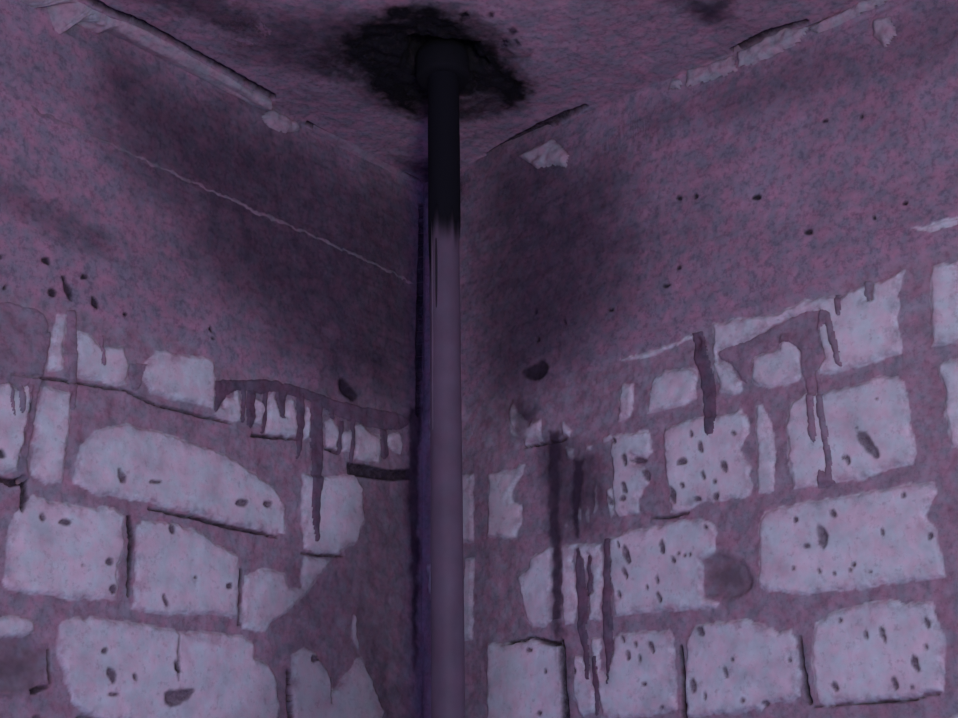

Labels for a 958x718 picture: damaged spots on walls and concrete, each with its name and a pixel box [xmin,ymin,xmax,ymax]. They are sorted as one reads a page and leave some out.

peeling [669,0,897,90]
peeling [518,139,570,169]
leakage [825,295,843,367]
leakage [692,331,717,435]
crack [250,434,292,442]
leakage [806,372,836,489]
spalling [858,433,879,458]
crack [126,509,268,586]
leakage [214,379,420,659]
leakage [549,433,614,716]
spalling [107,668,117,696]
spalling [165,689,193,706]